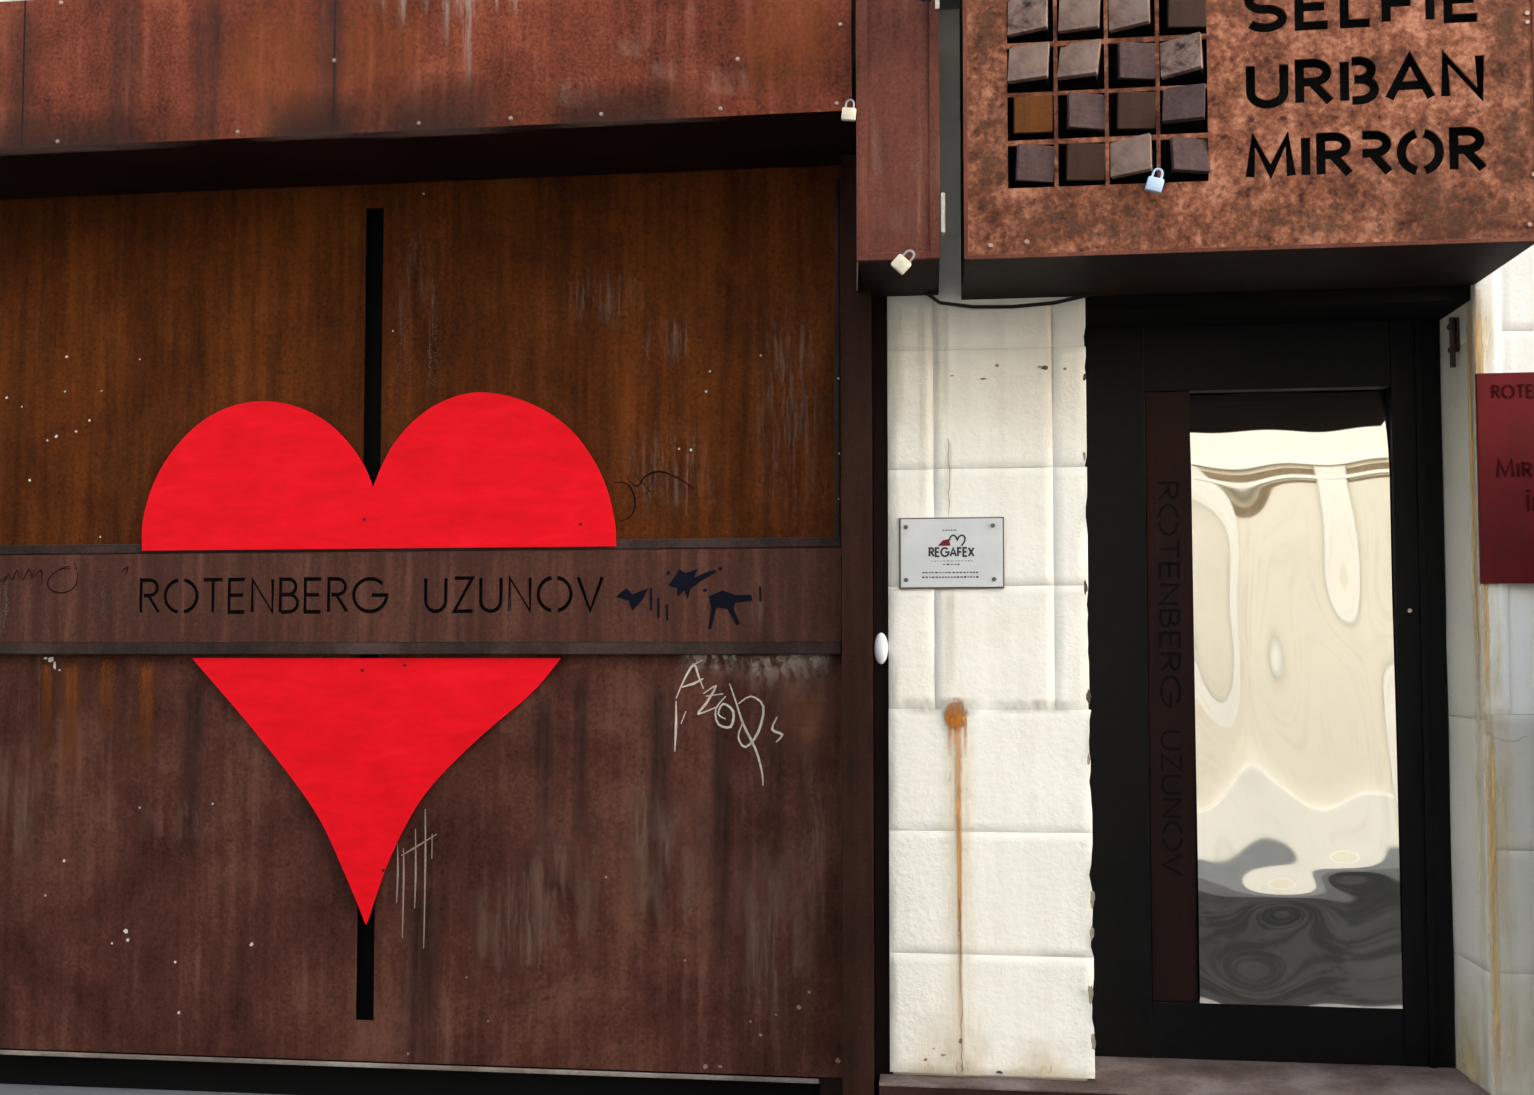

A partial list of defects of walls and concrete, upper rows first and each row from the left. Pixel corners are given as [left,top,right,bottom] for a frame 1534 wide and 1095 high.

rust [944,699,967,983]